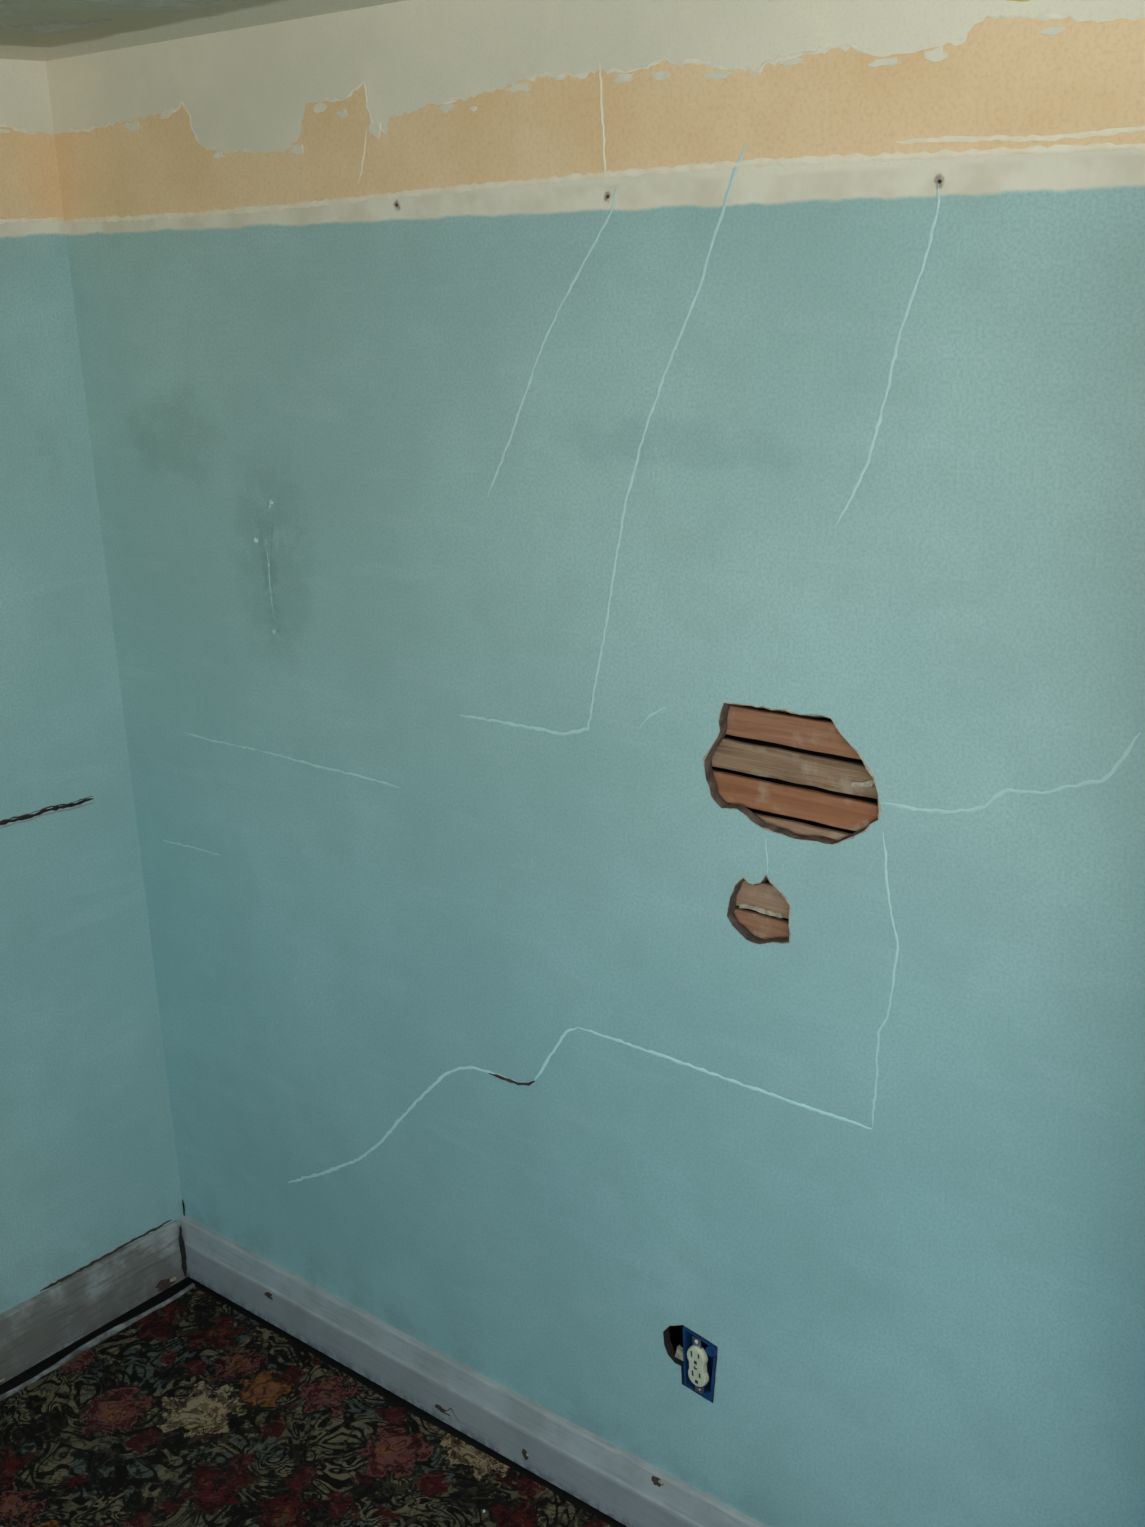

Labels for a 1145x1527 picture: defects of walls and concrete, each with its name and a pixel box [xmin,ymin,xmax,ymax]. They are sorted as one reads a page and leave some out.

peeling [0,0,1145,223]
crack [488,61,616,496]
crack [835,125,1145,527]
crack [459,142,748,736]
crack [0,796,94,829]
crack [184,732,400,788]
crack [288,732,1141,1183]
spalling [727,875,791,945]
spalling [703,703,882,845]